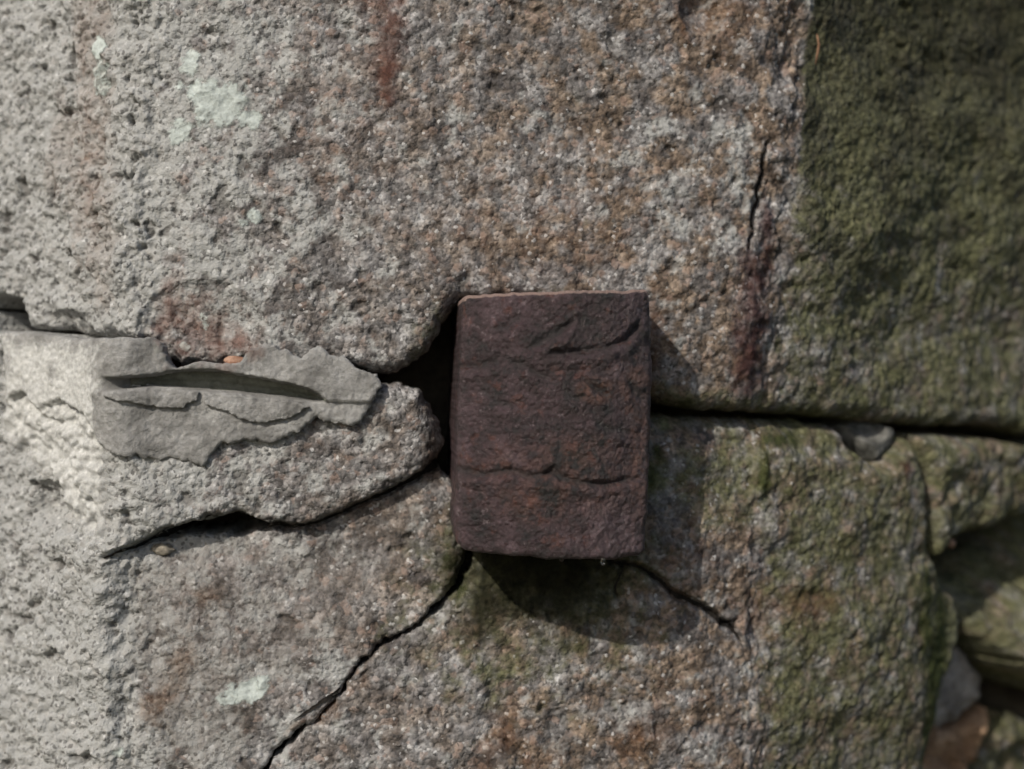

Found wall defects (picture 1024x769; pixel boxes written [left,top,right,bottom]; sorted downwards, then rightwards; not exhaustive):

crack [749,143,767,249]
peeling [1,331,382,544]
crack [267,459,438,528]
crack [103,511,244,559]
crack [429,552,471,609]
crack [608,560,742,642]
crack [262,637,388,769]